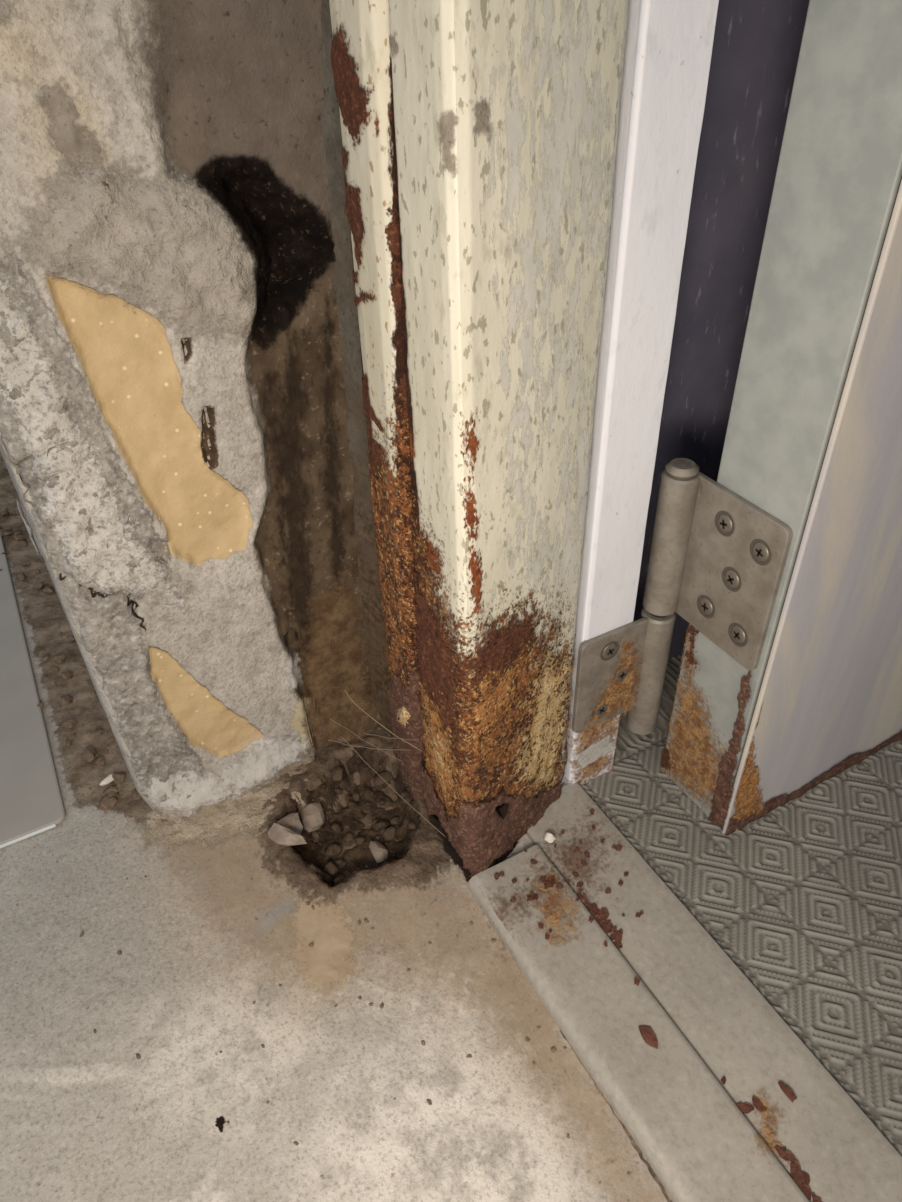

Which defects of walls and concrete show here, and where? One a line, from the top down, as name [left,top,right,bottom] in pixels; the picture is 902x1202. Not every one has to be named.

flaking render [38,79,106,174]
leakage [139,0,330,237]
spalling [196,156,336,349]
spalling [0,236,264,808]
leakage [247,255,381,736]
rust [301,24,644,949]
rust [660,625,902,836]
rust [638,1026,658,1049]
rust [736,1093,821,1202]
rust [778,1082,797,1103]